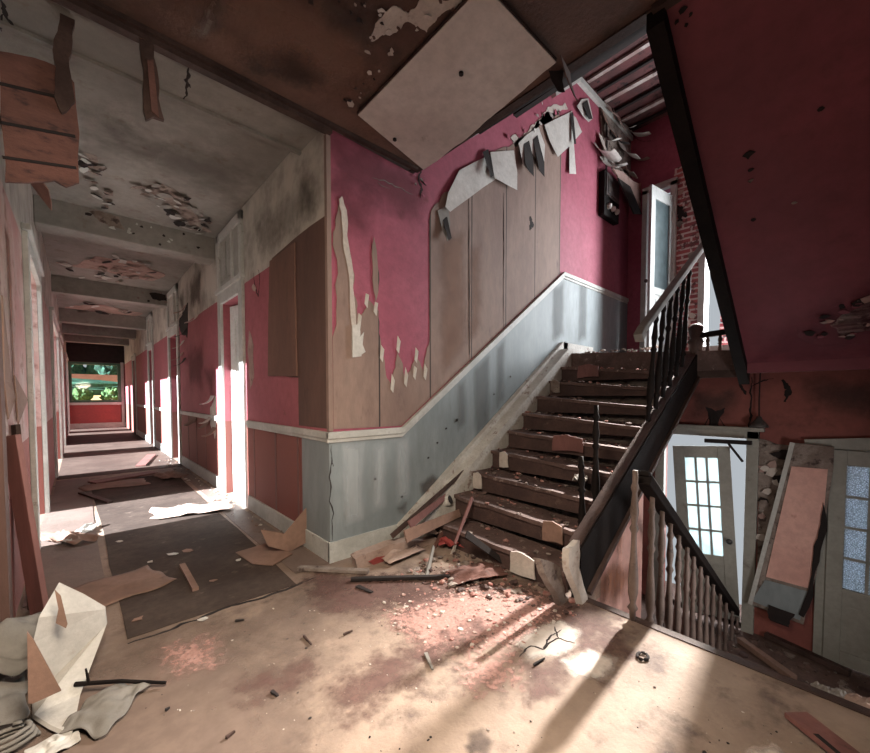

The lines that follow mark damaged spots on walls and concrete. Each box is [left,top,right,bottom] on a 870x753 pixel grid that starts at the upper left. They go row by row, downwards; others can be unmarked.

peeling [365,0,462,55]
flaking render [594,101,651,214]
peeling [78,152,152,234]
peeling [130,183,212,235]
peeling [56,255,165,282]
peeling [65,302,143,316]
peeling [137,292,167,303]
peeling [804,295,870,340]
flaking render [755,439,789,574]